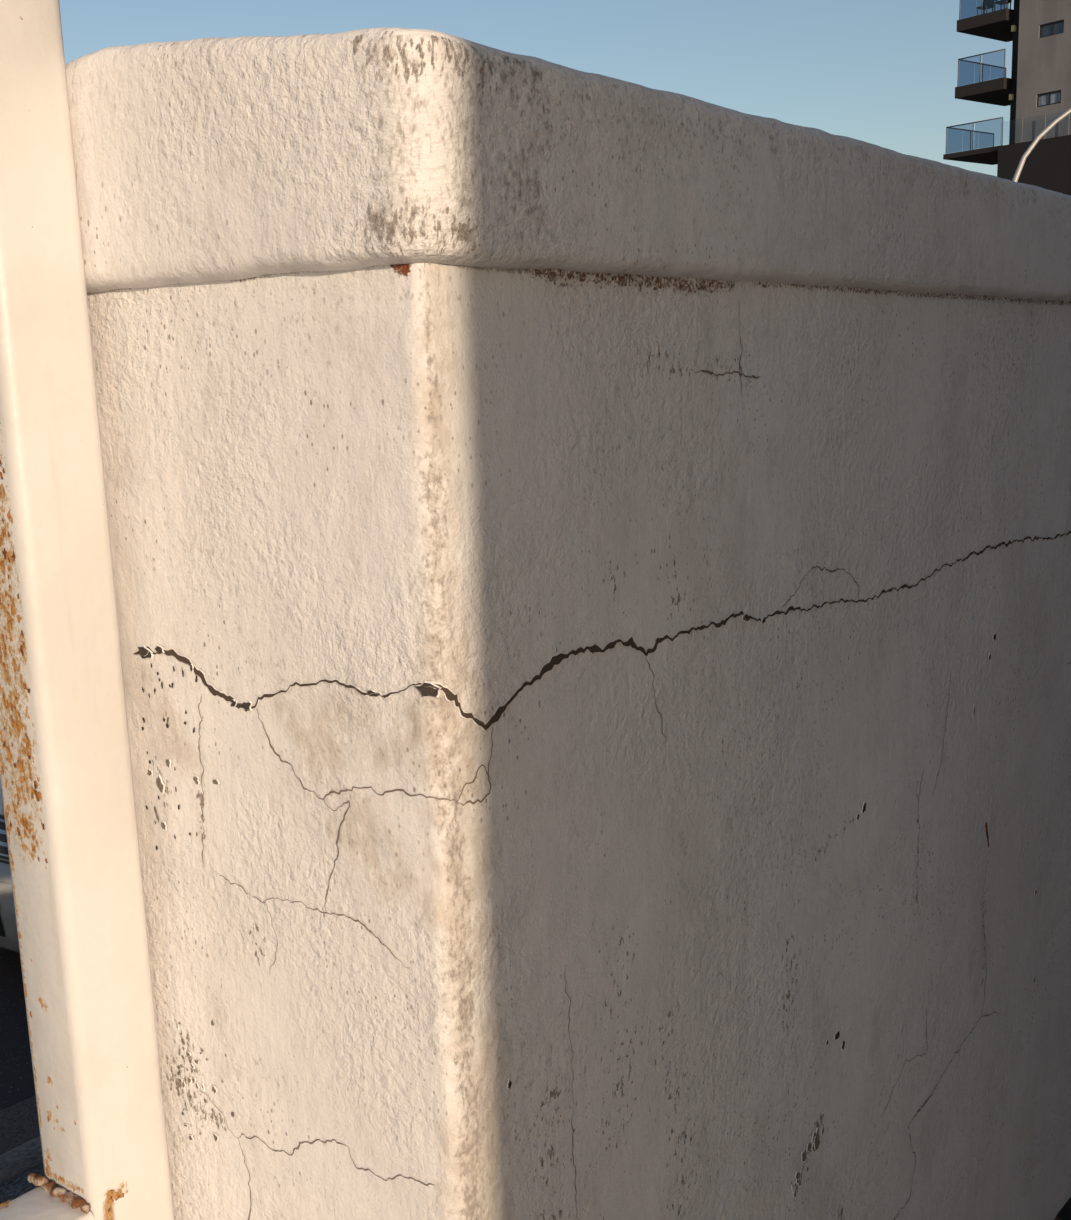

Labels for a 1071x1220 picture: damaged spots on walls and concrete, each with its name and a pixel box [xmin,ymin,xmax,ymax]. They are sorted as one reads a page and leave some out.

water stain [342,31,497,103]
water stain [357,175,492,267]
corrosion [0,457,48,938]
crack [133,530,1071,971]
corrosion [21,959,52,1085]
corrosion [45,1150,83,1193]
corrosion [105,1183,128,1220]